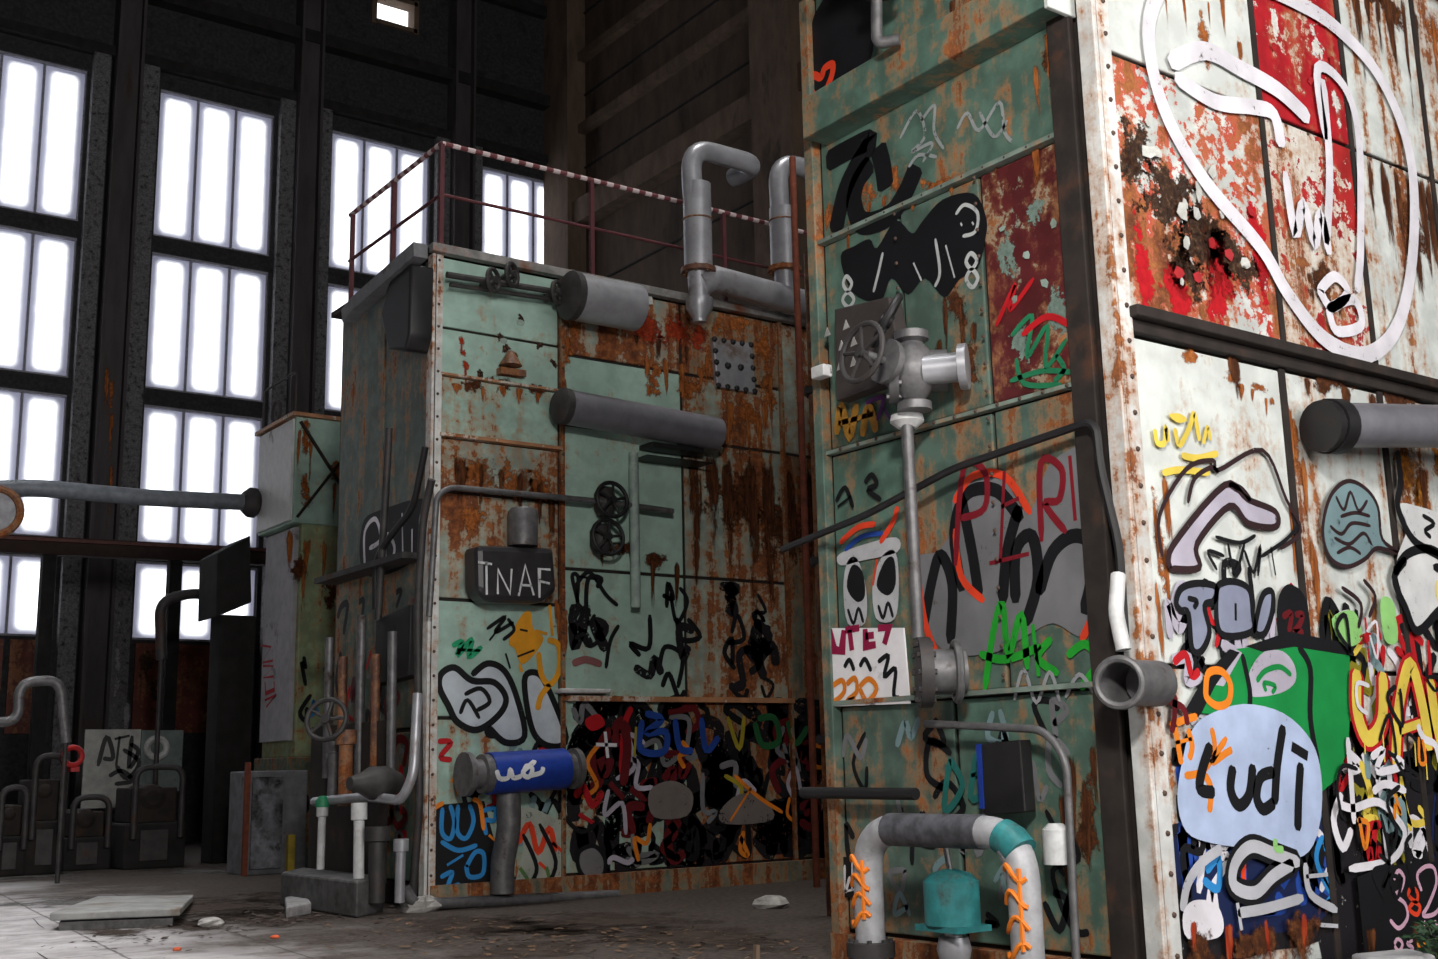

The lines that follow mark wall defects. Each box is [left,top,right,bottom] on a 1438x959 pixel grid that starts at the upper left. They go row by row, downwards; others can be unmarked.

peeling [1269,8,1279,52]
peeling [1310,22,1334,65]
corrosion [1352,0,1438,108]
peeling [1331,90,1341,128]
corrosion [920,176,953,196]
peeling [1119,113,1270,325]
corrosion [452,336,546,403]
corrosion [451,454,555,538]
corrosion [601,315,813,609]
corrosion [1151,475,1173,657]